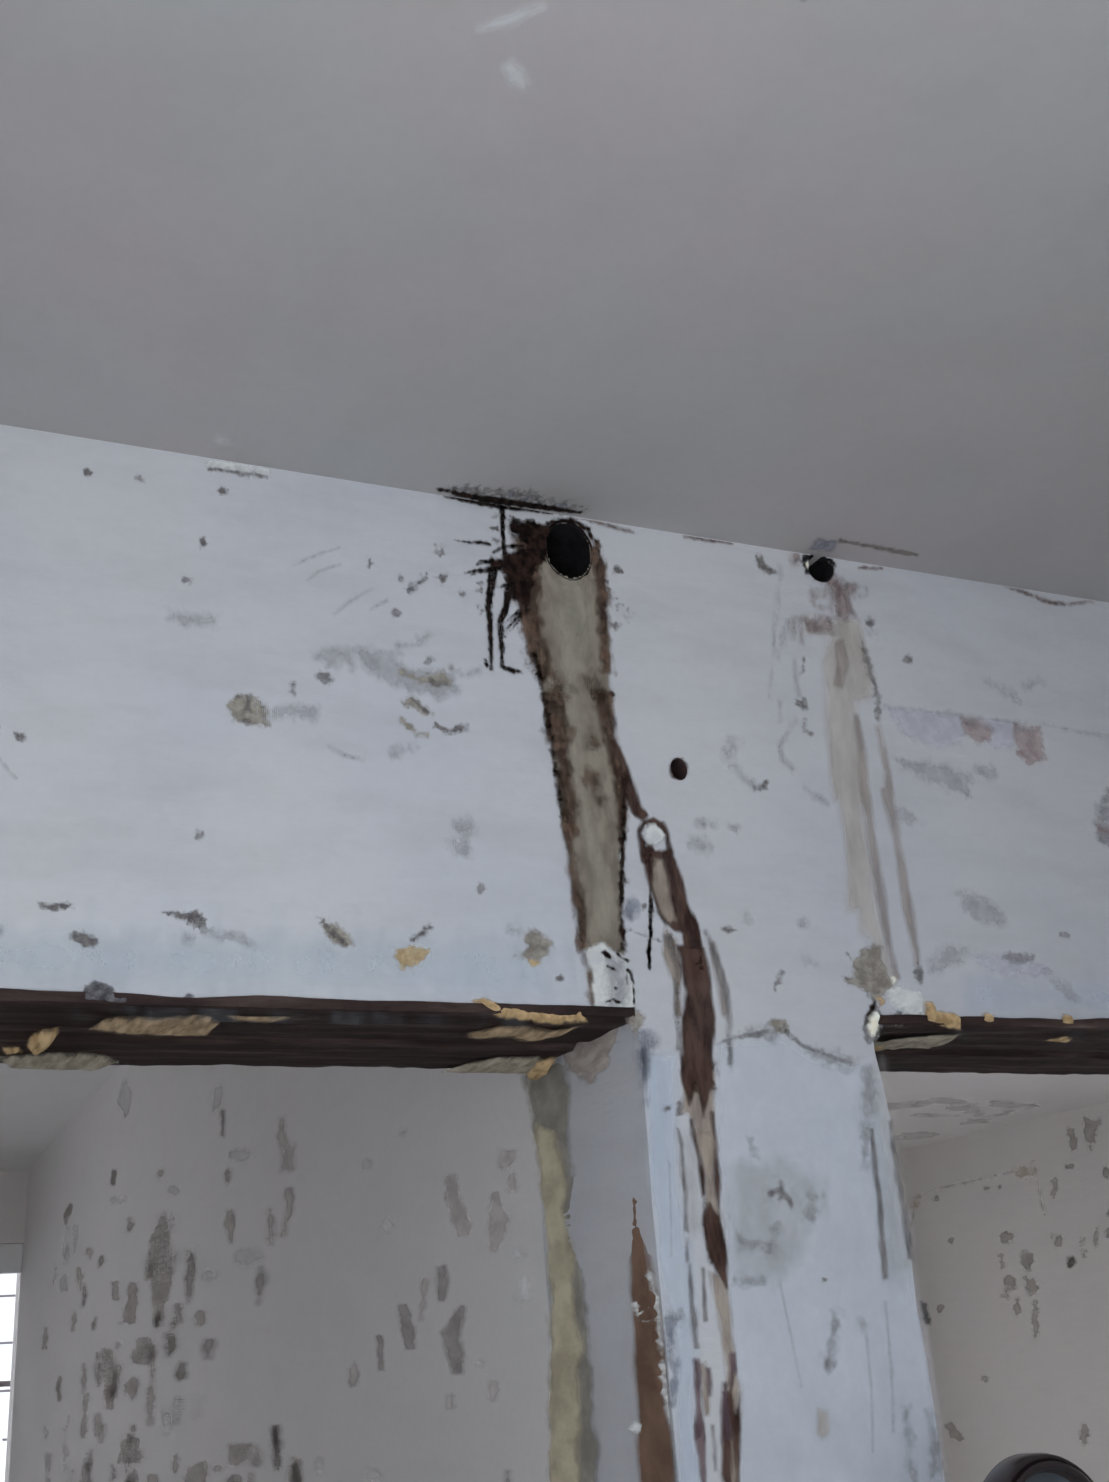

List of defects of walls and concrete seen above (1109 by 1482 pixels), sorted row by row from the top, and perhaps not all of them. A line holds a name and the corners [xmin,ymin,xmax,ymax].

crack [444,496,630,531]
spalling [227,683,306,725]
peeling [400,658,464,736]
rust [462,506,623,951]
spalling [72,931,97,947]
spalling [166,910,206,929]
spalling [322,920,351,947]
spalling [396,926,431,969]
rust [598,690,740,1482]
peeling [398,1266,464,1374]
peeling [81,1218,213,1482]
peeling [173,1426,301,1482]